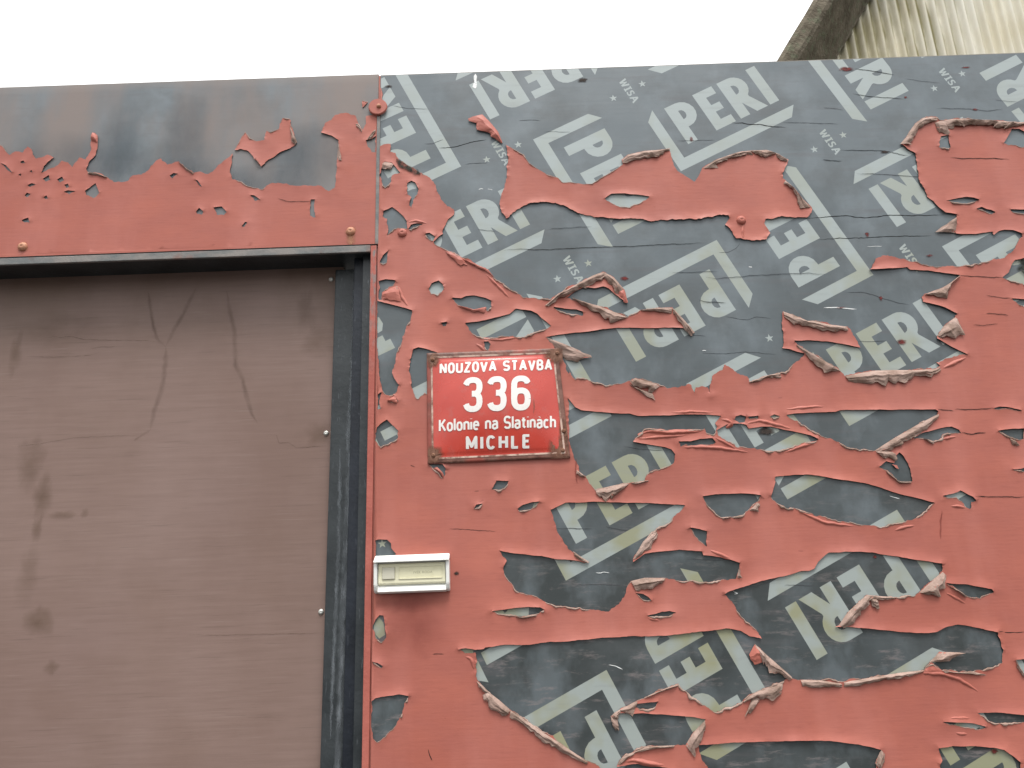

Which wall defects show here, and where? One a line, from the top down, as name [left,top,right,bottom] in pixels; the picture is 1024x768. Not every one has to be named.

peeling [0,53,1024,401]
peeling [376,280,436,448]
peeling [999,429,1023,446]
peeling [430,464,446,478]
peeling [376,539,396,556]
peeling [459,399,1003,768]
peeling [373,615,386,643]
peeling [372,694,408,743]
peeling [944,712,1024,730]
peeling [939,746,1020,768]